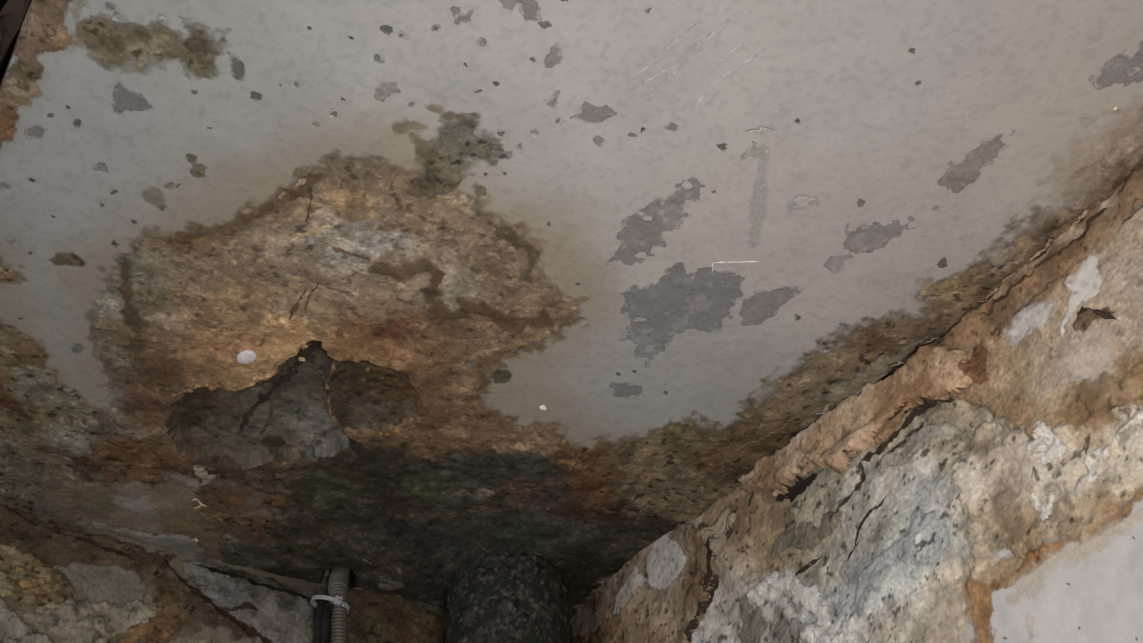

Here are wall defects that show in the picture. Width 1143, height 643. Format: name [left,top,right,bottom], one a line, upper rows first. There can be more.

leakage [0,0,224,148]
peeling [665,121,679,133]
peeling [938,130,1015,193]
peeling [1089,42,1143,90]
spalling [165,340,422,509]
leakage [0,112,1143,626]
spalling [566,174,1143,643]
corrosion [1056,356,1143,423]
spalling [0,541,161,643]
corrosion [955,488,1143,643]